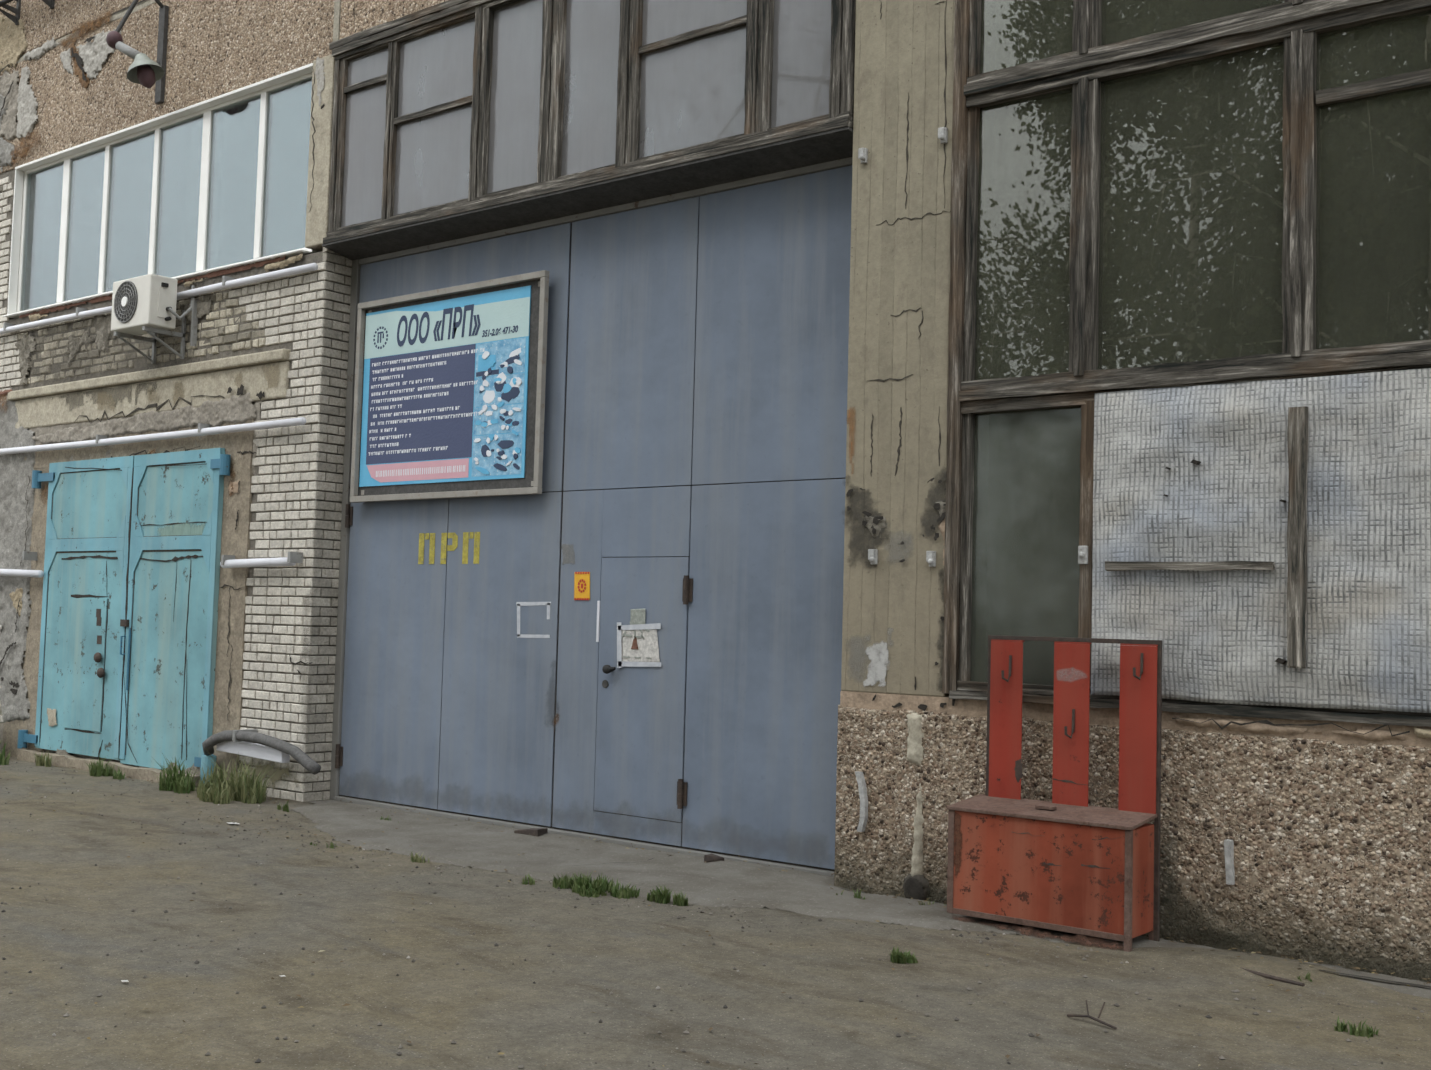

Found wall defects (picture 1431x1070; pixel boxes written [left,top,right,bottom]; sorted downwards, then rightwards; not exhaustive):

spalling [0,14,122,172]
crack [877,0,951,225]
spalling [67,314,116,367]
crack [891,308,923,339]
crack [868,374,913,475]
crack [935,406,943,466]
spalling [845,472,947,567]
spalling [0,588,23,695]